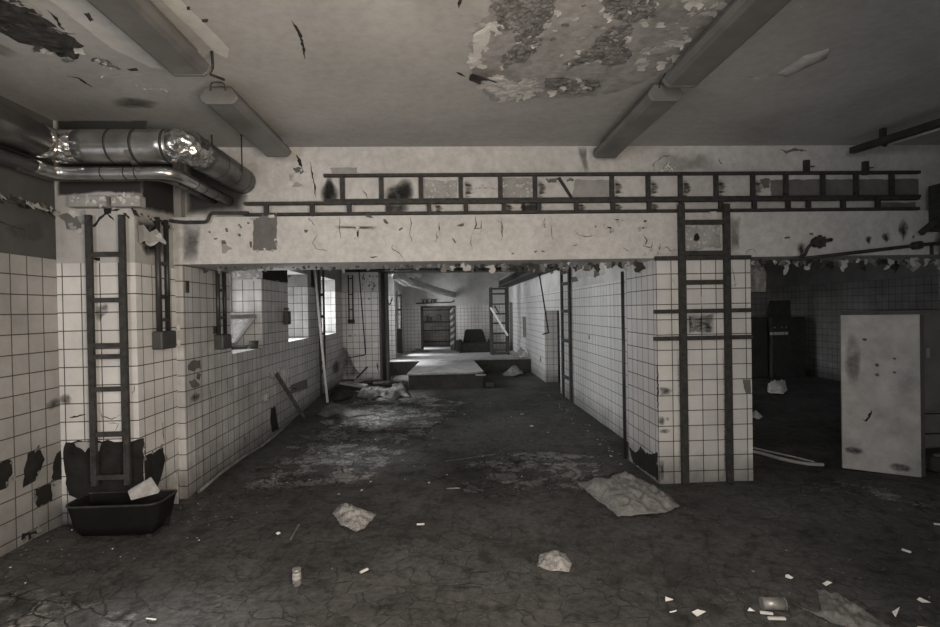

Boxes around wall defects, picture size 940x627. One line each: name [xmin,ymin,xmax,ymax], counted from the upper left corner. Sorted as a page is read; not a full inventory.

crack [291,20,306,59]
peeling [466,0,728,103]
water stain [388,182,411,199]
flaking render [209,213,277,254]
crack [392,216,440,259]
crack [470,216,503,250]
crack [541,219,675,256]
peeling [203,250,646,300]
peeling [750,257,940,275]
peeling [0,438,169,507]
flaking render [629,445,659,481]